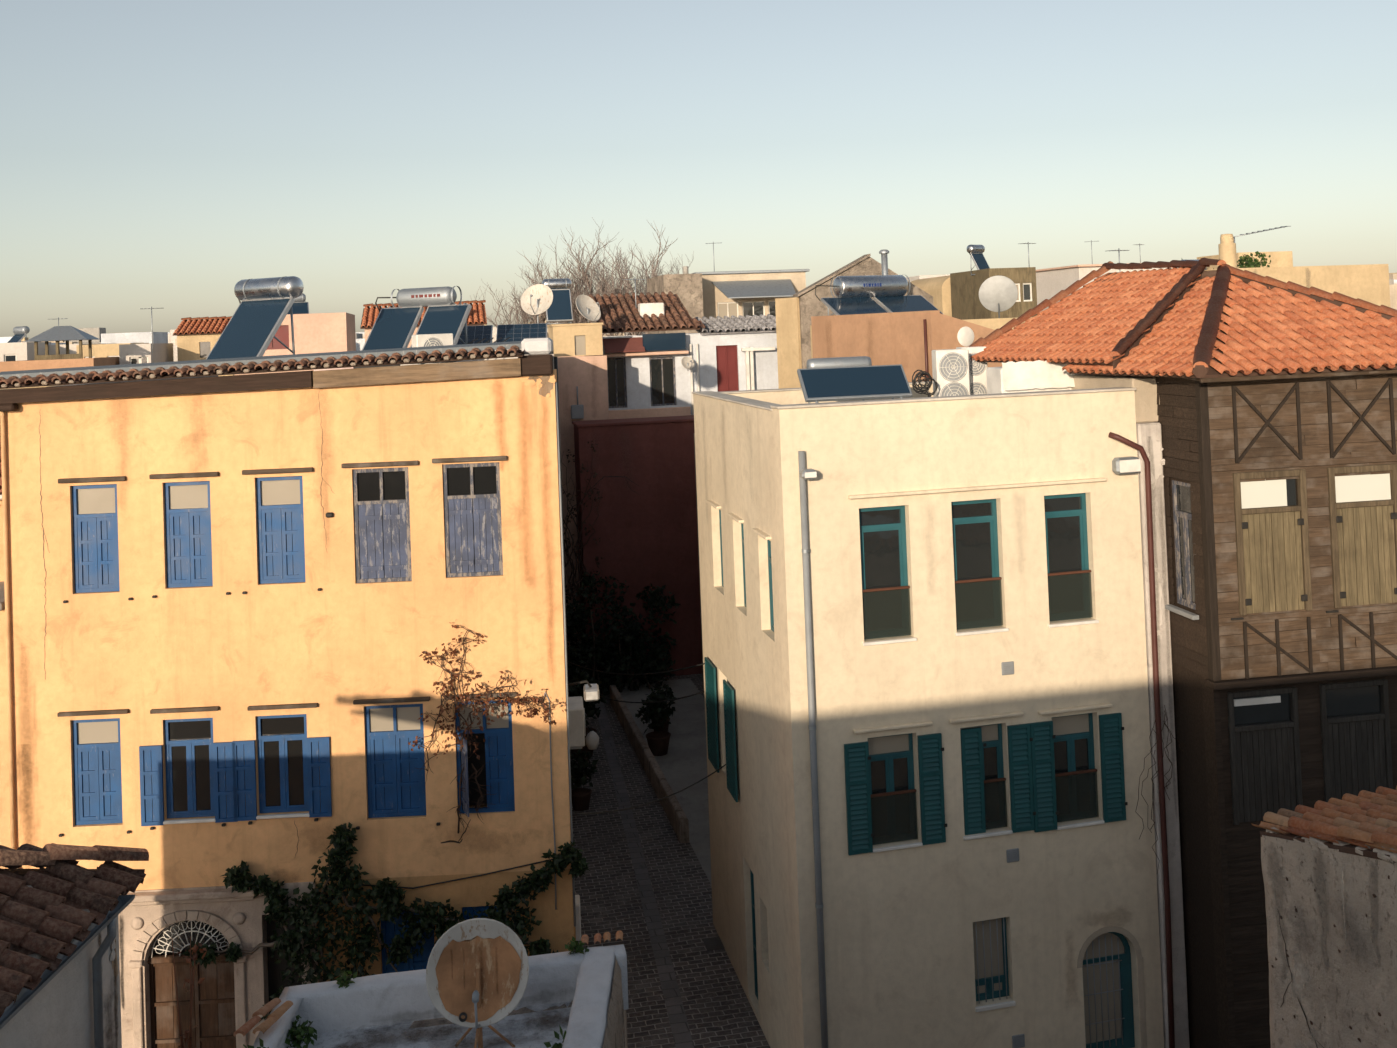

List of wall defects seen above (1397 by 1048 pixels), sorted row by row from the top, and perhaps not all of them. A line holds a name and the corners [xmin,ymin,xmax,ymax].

crack [1278,911,1324,1048]